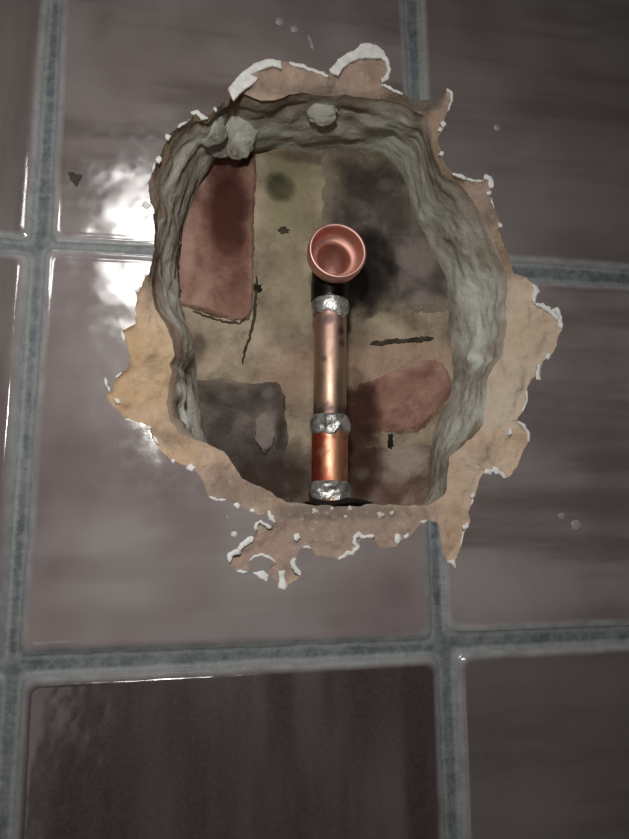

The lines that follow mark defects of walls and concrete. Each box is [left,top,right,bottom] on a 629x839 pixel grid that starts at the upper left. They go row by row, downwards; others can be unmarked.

crack [174,179,258,364]
spalling [104,43,563,590]
crack [370,336,434,346]